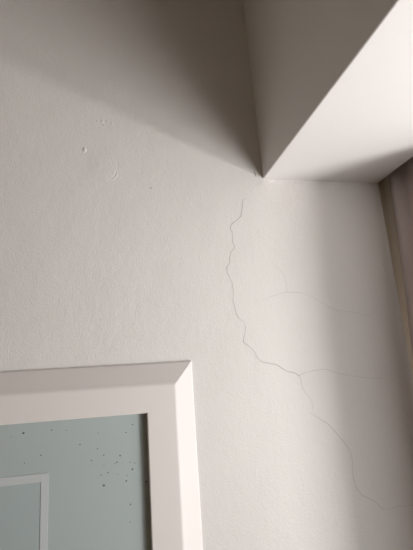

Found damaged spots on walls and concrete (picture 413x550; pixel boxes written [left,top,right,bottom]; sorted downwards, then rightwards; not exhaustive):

crack [226,184,306,377]